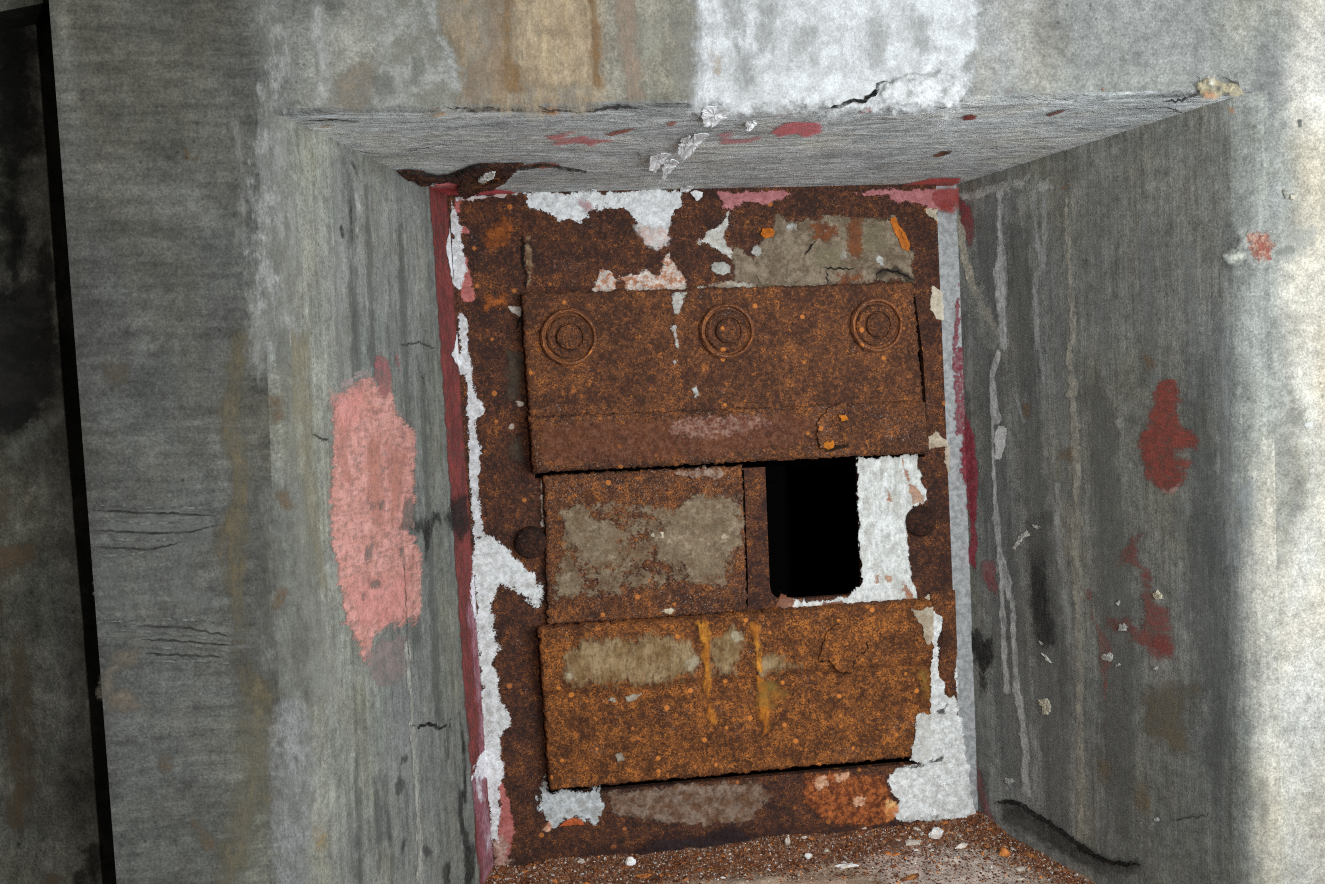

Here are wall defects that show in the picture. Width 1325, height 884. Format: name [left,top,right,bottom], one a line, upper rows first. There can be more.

crack [831,81,885,109]
peeling [398,105,998,364]
rust [760,228,775,238]
rust [890,217,910,252]
rust [816,403,851,452]
peeling [452,312,816,843]
rust [698,621,717,724]
rust [750,623,782,733]
peeling [776,431,988,853]
rust [921,590,957,698]
rust [593,770,892,856]
crack [995,798,1140,874]